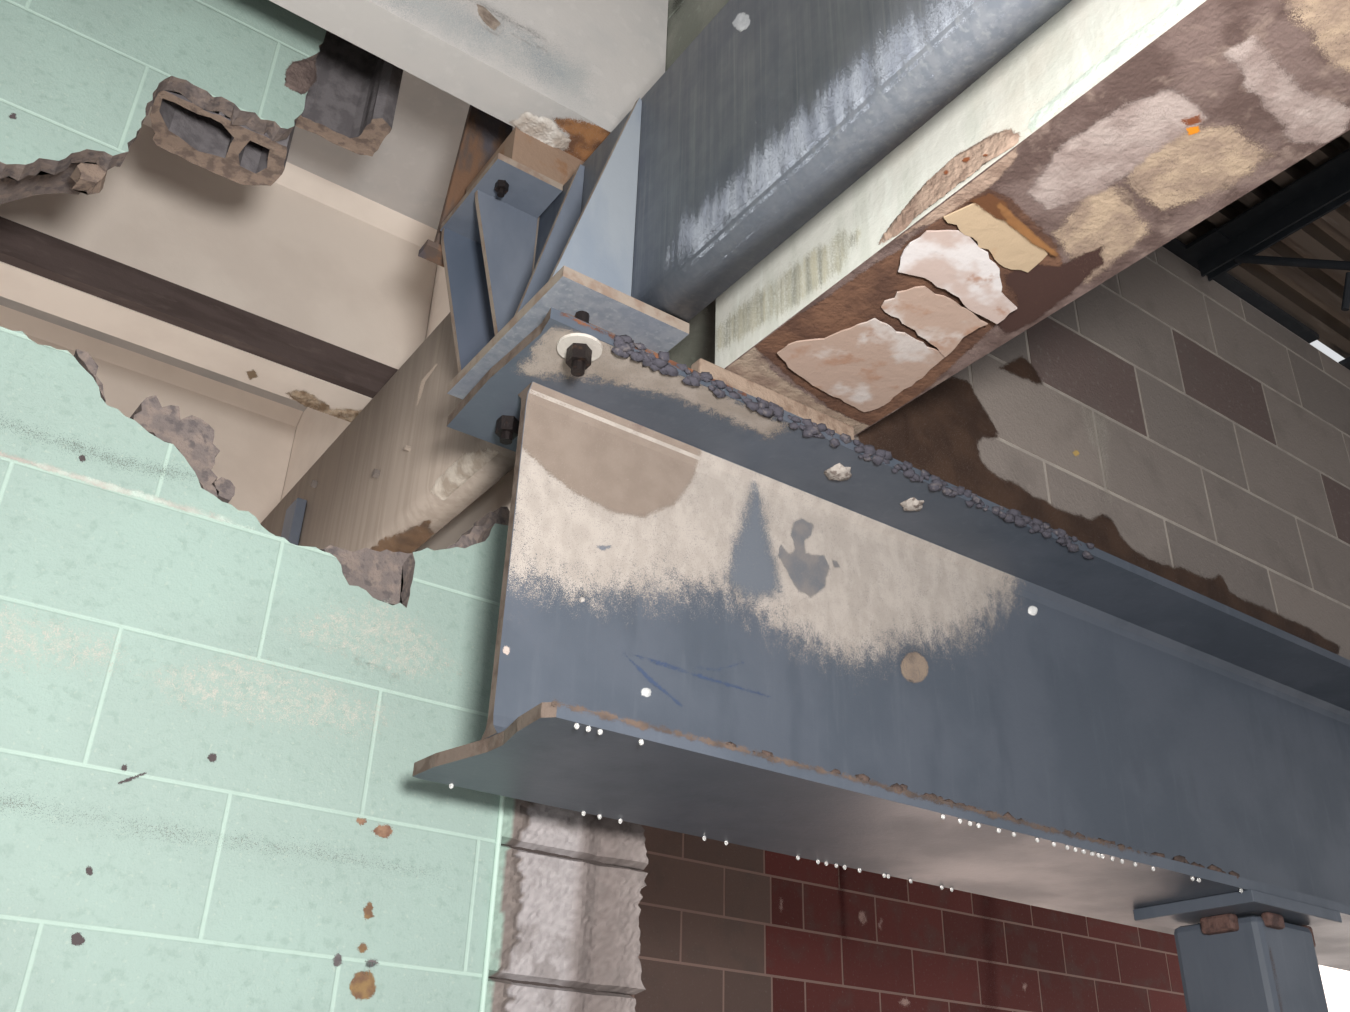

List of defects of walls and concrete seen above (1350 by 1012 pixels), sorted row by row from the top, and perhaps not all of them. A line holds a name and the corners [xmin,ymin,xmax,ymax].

spalling [284,59,317,94]
peeling [726,0,1197,434]
spalling [74,349,106,402]
spalling [286,390,362,422]
spalling [130,395,220,497]
leakage [507,325,1029,691]
spalling [320,545,412,605]